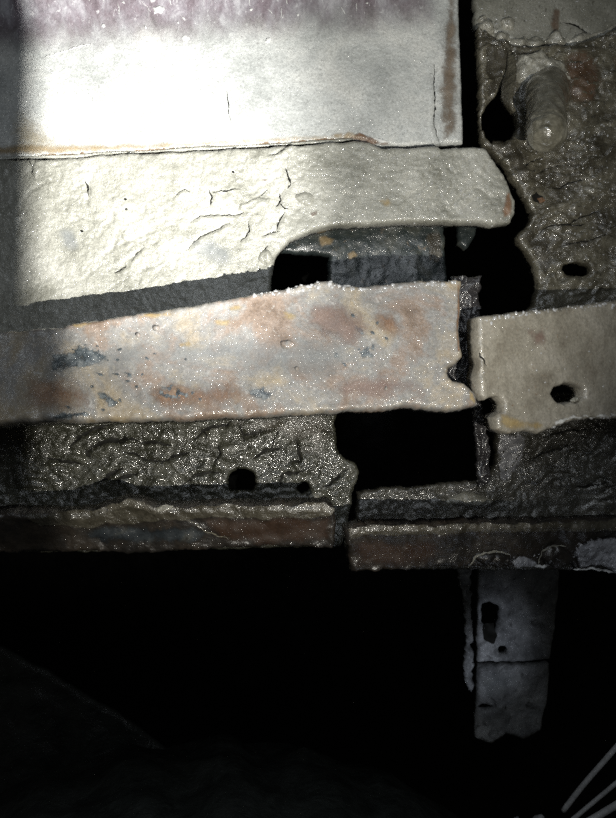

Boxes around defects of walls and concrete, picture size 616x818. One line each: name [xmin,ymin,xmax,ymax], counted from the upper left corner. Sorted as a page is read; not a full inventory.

crack [432,66,440,143]
corrosion [441,2,456,135]
crack [175,143,291,250]
peeling [52,345,122,370]
peeling [91,385,121,411]
peeling [250,387,272,400]
peeling [447,275,481,386]
peeling [471,401,491,487]